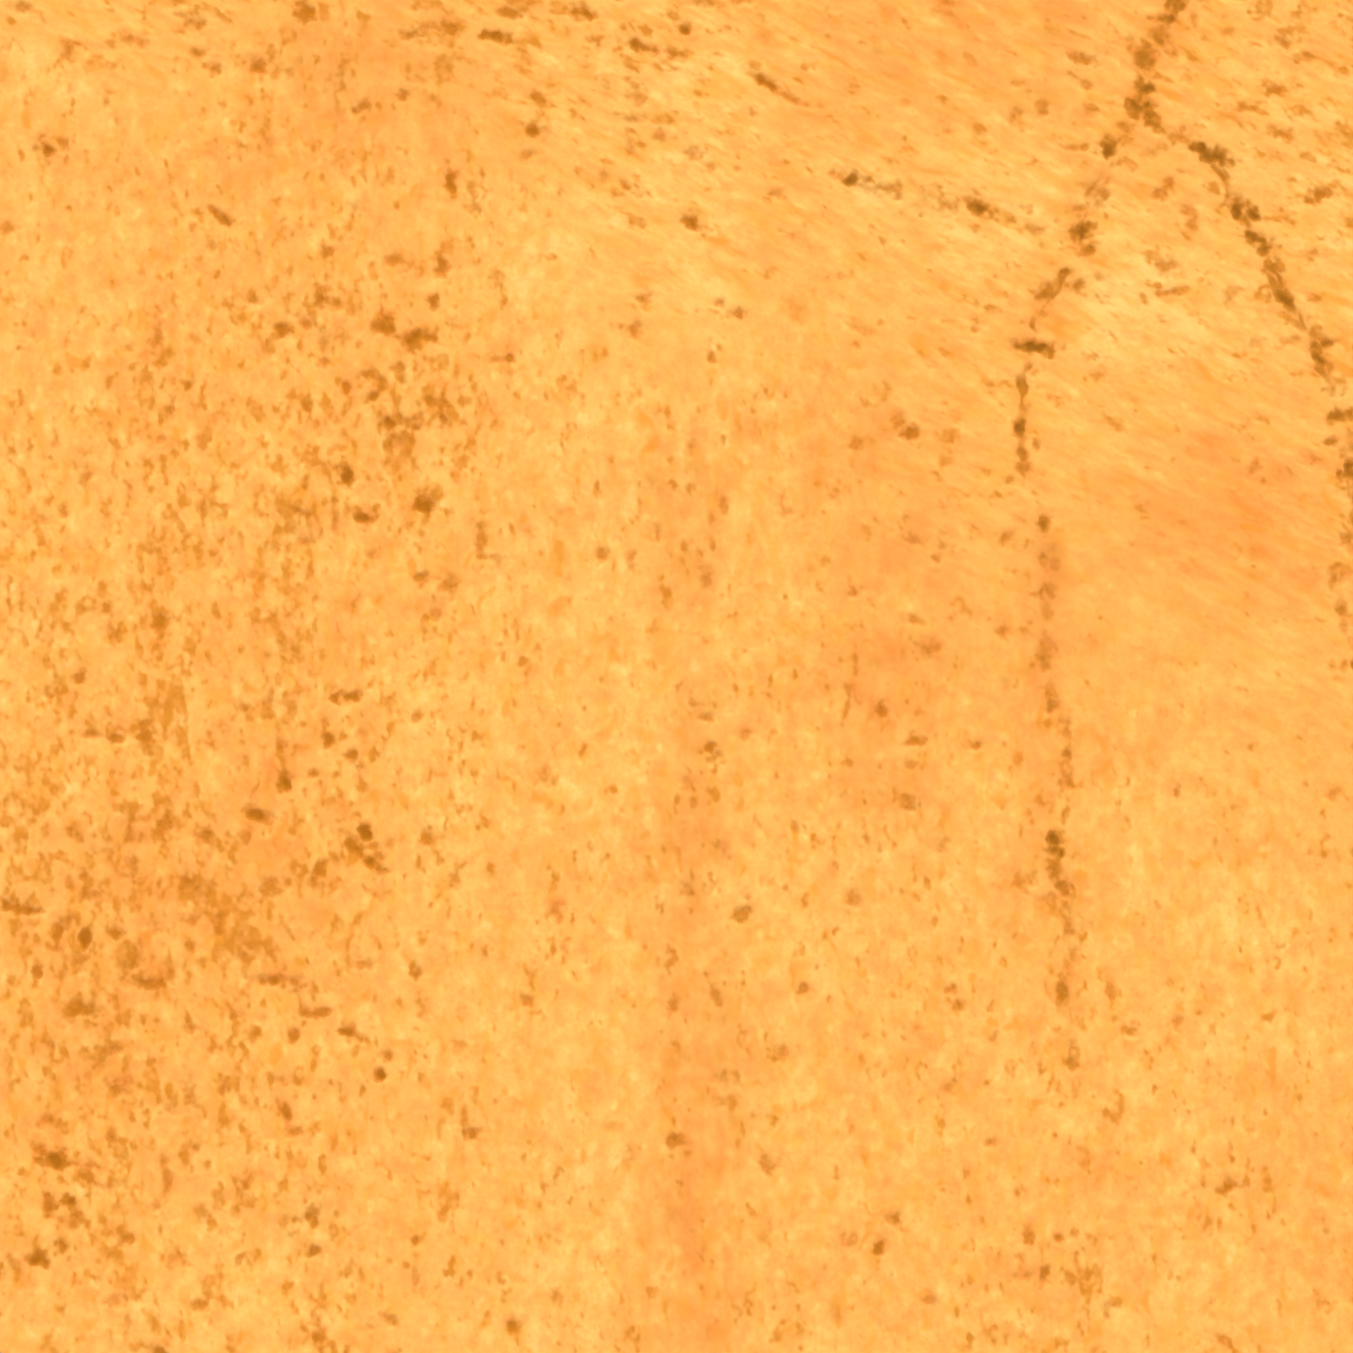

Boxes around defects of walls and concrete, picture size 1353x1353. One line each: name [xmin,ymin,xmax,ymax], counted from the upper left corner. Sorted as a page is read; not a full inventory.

crack [1014,0,1353,479]
crack [1342,513,1353,543]
crack [1038,516,1050,594]
crack [1331,574,1346,614]
crack [1048,700,1056,711]
crack [1046,750,1072,924]
crack [1058,982,1068,999]
crack [1065,1057,1075,1068]